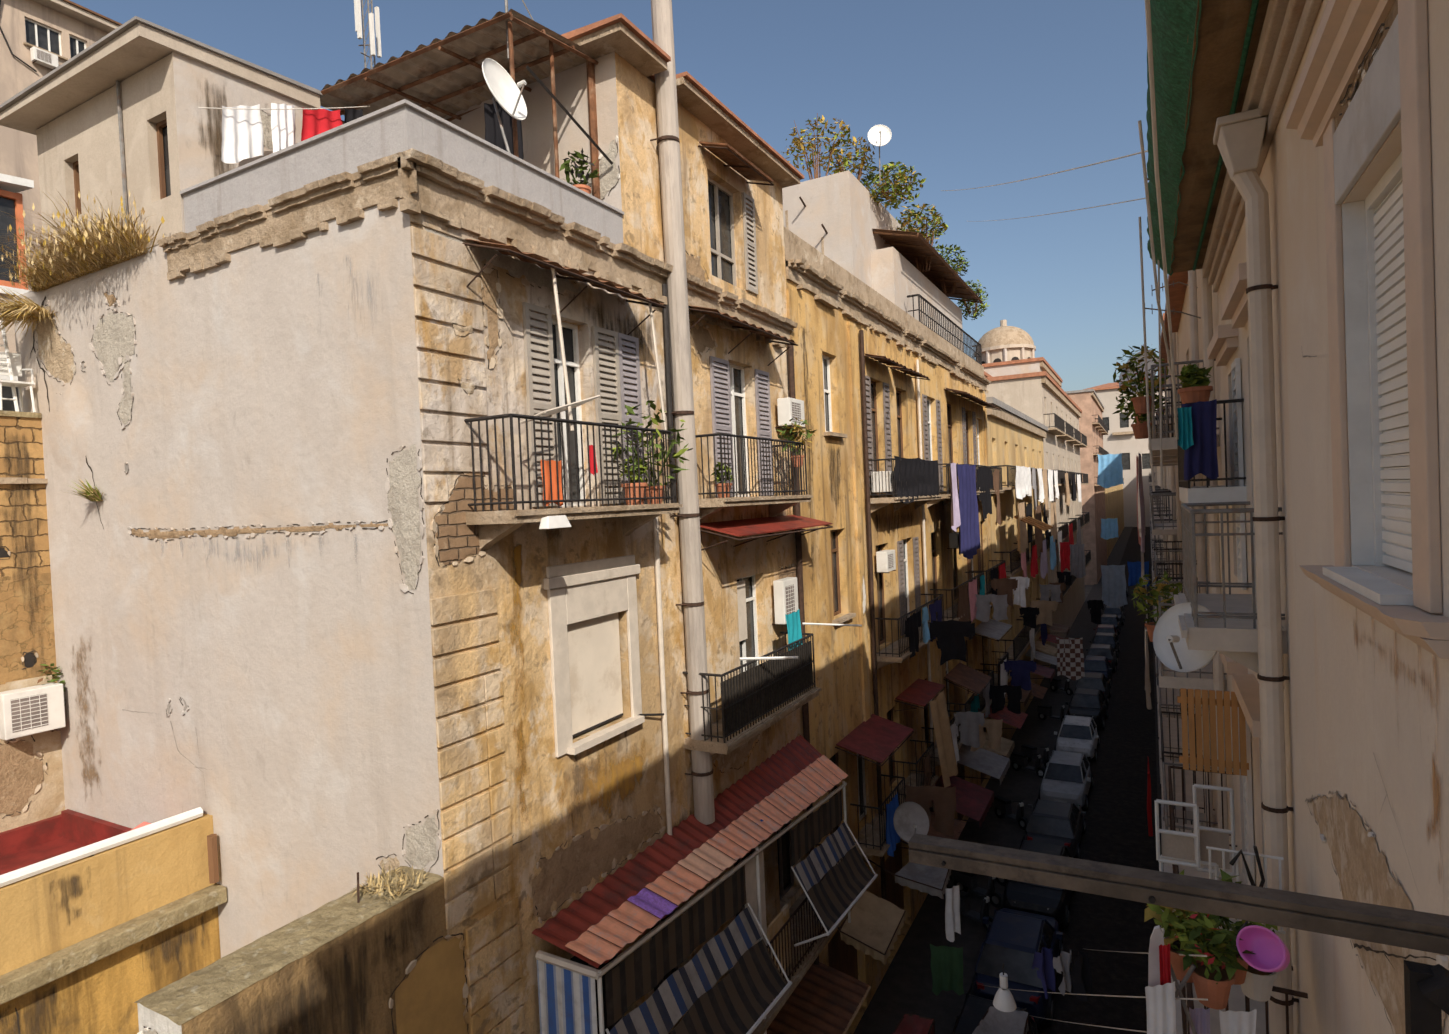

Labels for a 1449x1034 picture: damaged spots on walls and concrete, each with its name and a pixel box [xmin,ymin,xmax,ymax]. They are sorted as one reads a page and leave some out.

spalling [35,290,137,430]
spalling [127,444,519,594]
spalling [0,735,48,819]
spalling [376,809,441,874]
spalling [1305,790,1413,910]
water stain [61,876,81,923]
spalling [1350,939,1448,1034]